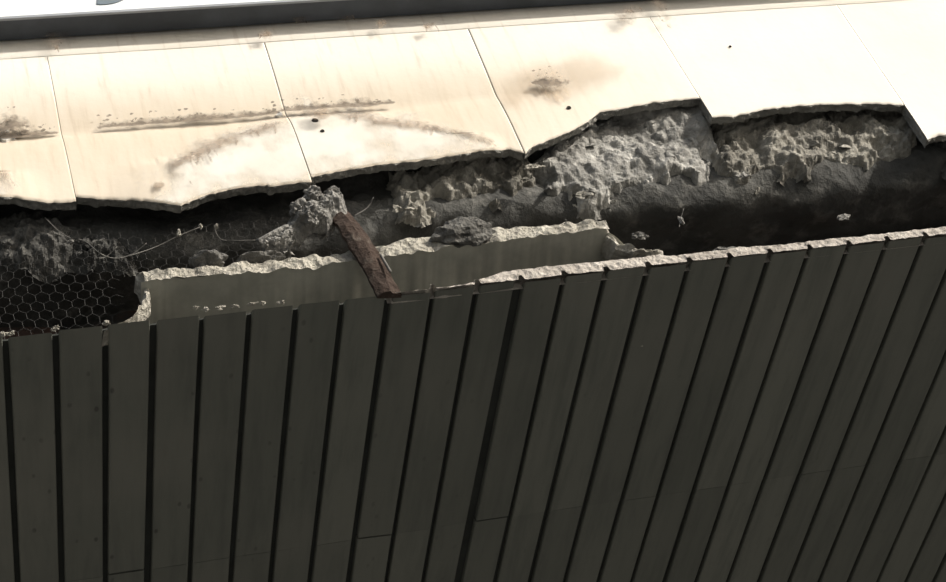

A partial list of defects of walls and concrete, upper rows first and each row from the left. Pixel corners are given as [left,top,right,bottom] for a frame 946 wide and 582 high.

water stain [532,66,568,88]
water stain [0,107,58,139]
water stain [97,94,411,128]
spalling [386,105,917,228]
spalling [0,211,139,284]
flaking render [632,231,649,240]